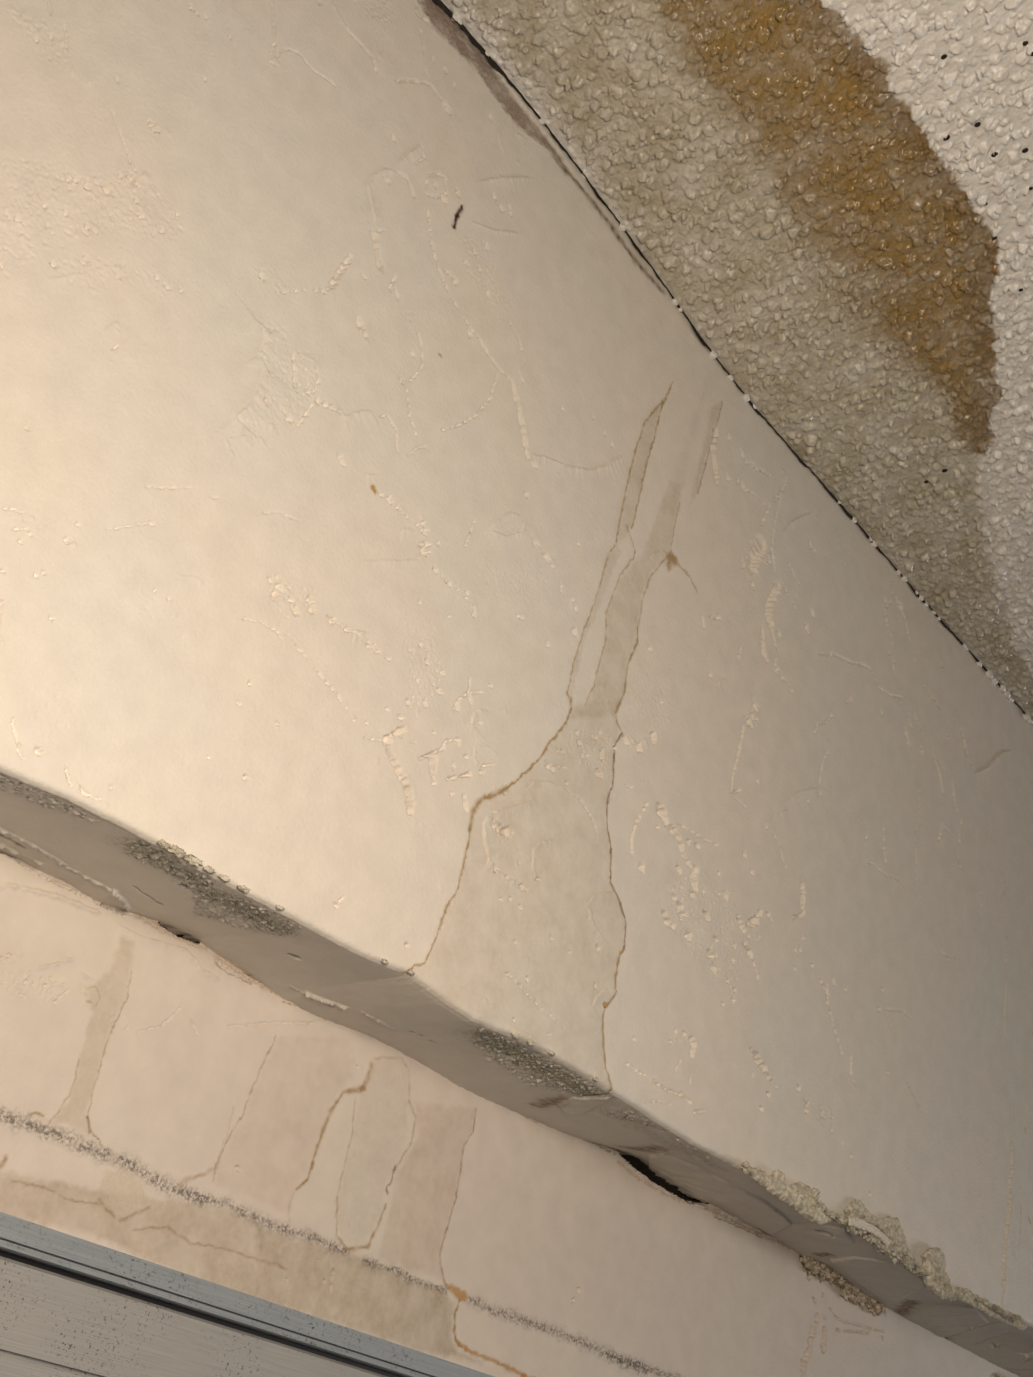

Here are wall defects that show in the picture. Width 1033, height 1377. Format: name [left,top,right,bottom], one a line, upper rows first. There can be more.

damp [664,0,998,431]
crack [433,0,1025,714]
crack [628,796,662,882]
flaking render [652,794,775,1009]
crack [0,1100,693,1377]
peeling [470,1027,833,1290]
peeling [846,1199,1030,1337]